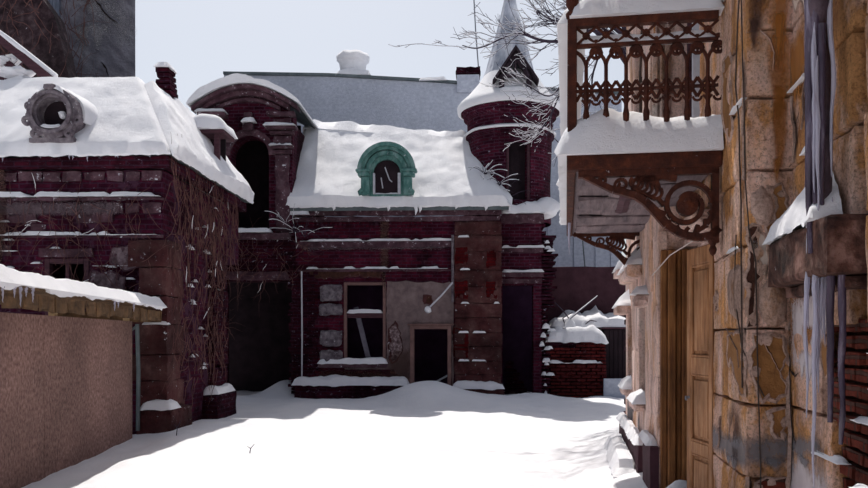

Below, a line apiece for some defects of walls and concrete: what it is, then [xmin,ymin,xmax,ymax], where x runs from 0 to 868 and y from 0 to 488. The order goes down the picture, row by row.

crack [95,0,120,25]
water stain [751,0,762,47]
peeling [726,182,790,442]
crack [715,416,723,448]
crack [759,333,798,488]